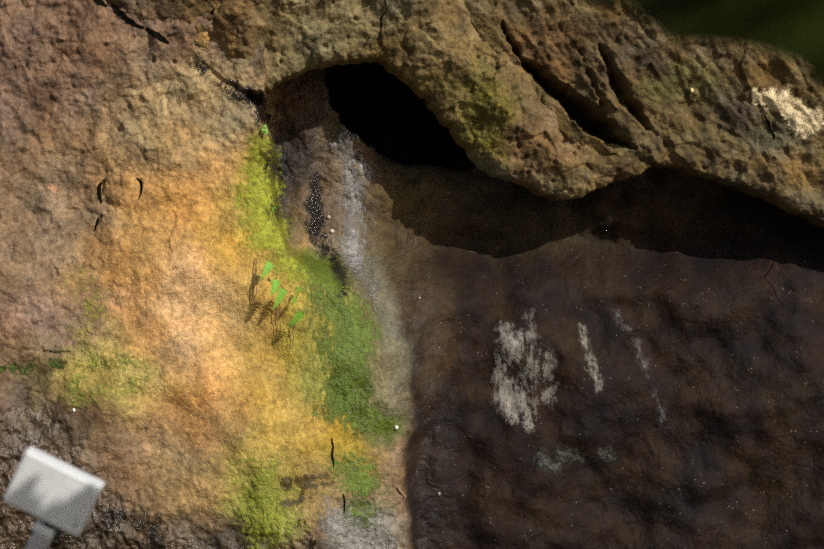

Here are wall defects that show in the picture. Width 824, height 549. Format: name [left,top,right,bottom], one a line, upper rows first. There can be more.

crack [94,0,169,44]
crack [377,0,387,51]
damp [492,312,559,432]
damp [578,323,603,391]